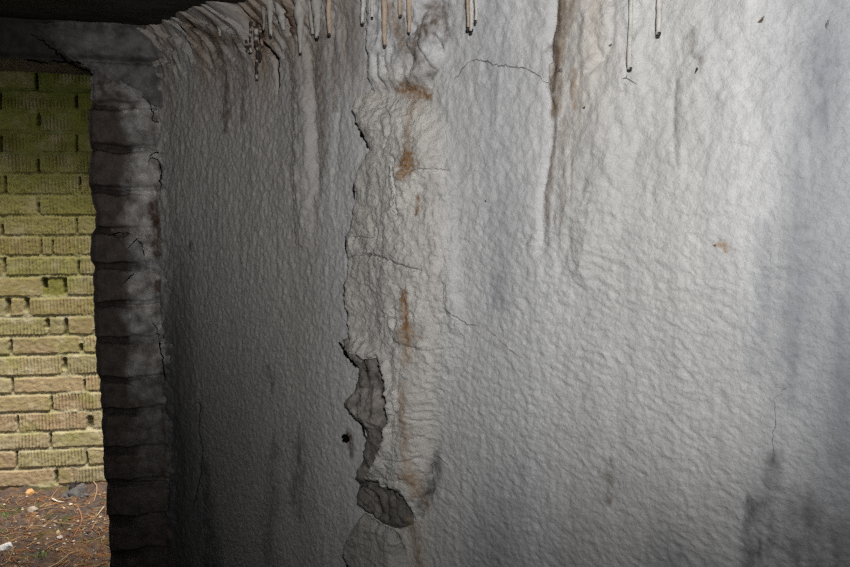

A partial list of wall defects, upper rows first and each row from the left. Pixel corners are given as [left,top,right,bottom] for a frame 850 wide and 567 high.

crack [454,3,559,85]
leakage [551,0,565,114]
crack [148,151,163,189]
corrosion [397,152,413,179]
crack [109,232,144,254]
peeling [343,87,468,567]